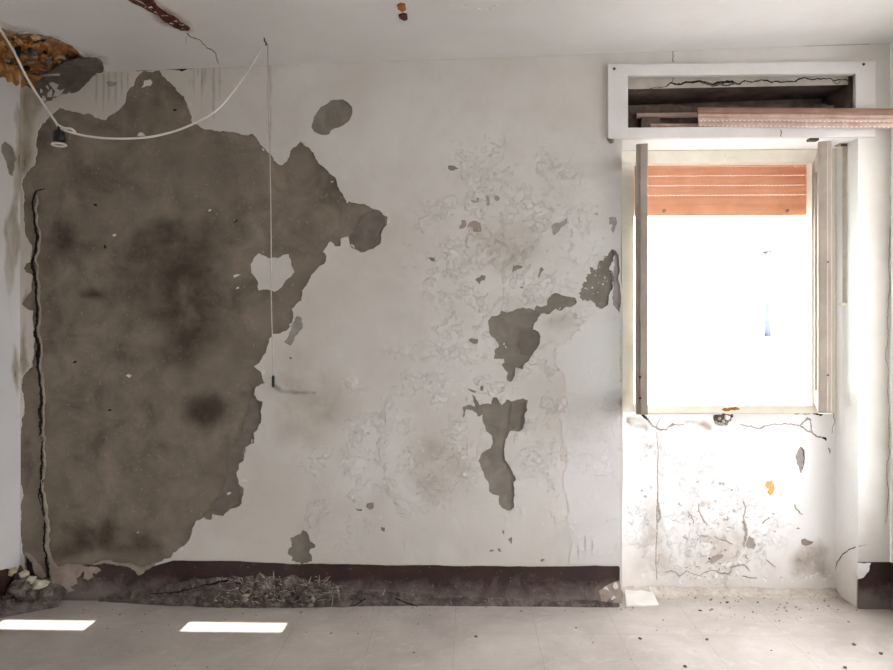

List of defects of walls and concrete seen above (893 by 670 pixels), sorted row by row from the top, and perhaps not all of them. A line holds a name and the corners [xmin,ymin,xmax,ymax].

corrosion [395,3,410,25]
crack [630,54,848,92]
water stain [150,241,207,351]
flaking render [0,28,390,593]
flaking render [488,249,621,382]
crack [30,188,54,581]
flaking render [463,386,528,511]
crack [641,415,775,579]
crack [740,413,835,453]